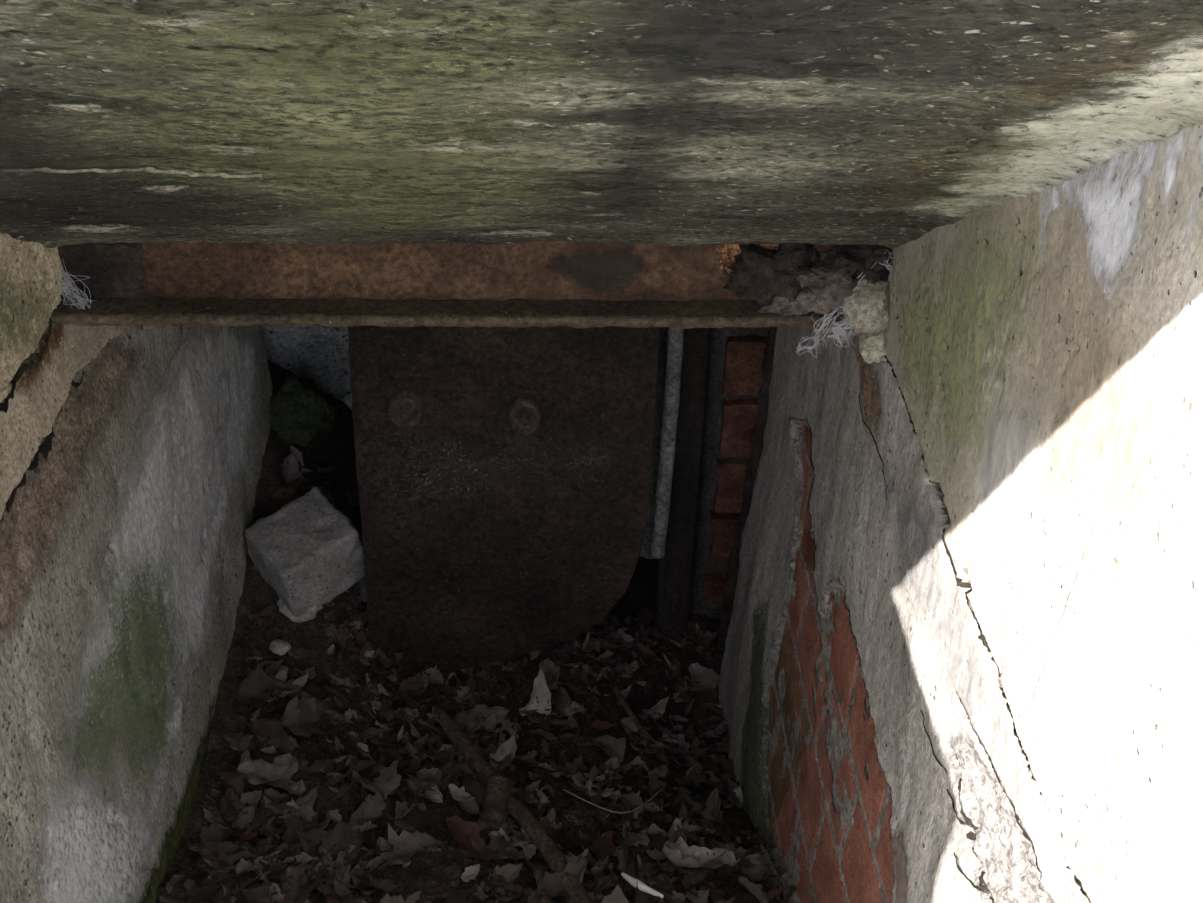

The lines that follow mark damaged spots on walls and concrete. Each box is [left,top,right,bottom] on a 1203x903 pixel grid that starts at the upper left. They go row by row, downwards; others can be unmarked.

water stain [142,19,205,31]
water stain [0,107,239,233]
water stain [560,9,826,216]
water stain [919,49,1203,283]
corrosion [57,242,148,302]
crack [0,318,52,413]
crack [0,372,84,522]
crack [884,356,940,486]
water stain [46,327,256,903]
peeling [759,417,894,903]
crack [921,528,1091,903]
flaking render [945,734,1055,903]